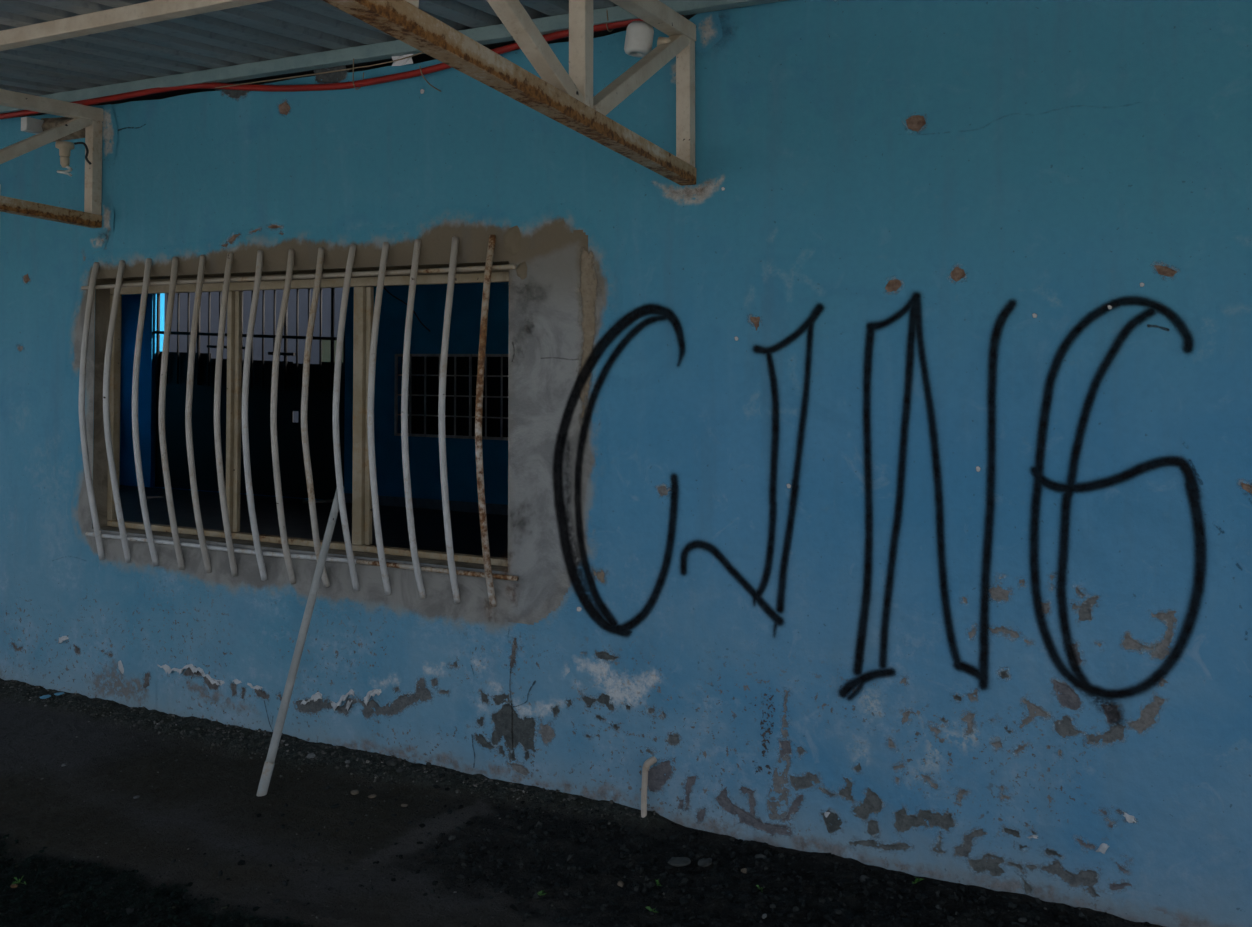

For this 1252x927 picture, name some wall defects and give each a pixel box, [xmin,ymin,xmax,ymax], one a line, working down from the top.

spalling [906,115,926,132]
spalling [885,278,902,293]
spalling [1154,263,1177,277]
peeling [1070,586,1099,621]
peeling [581,651,619,661]
peeling [1120,610,1177,660]
peeling [143,664,449,719]
crack [509,638,536,750]
peeling [474,689,631,778]
peeling [990,678,1168,757]
peeling [646,733,681,792]
peeling [678,689,1137,897]